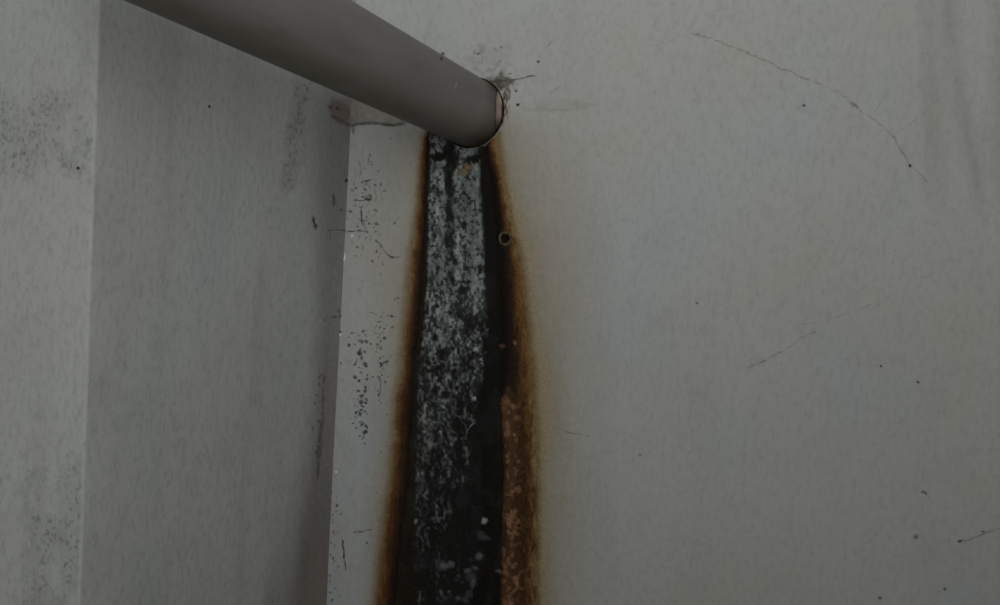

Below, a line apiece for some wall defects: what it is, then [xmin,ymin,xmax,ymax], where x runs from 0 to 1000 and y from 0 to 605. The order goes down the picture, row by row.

water stain [348,131,554,605]